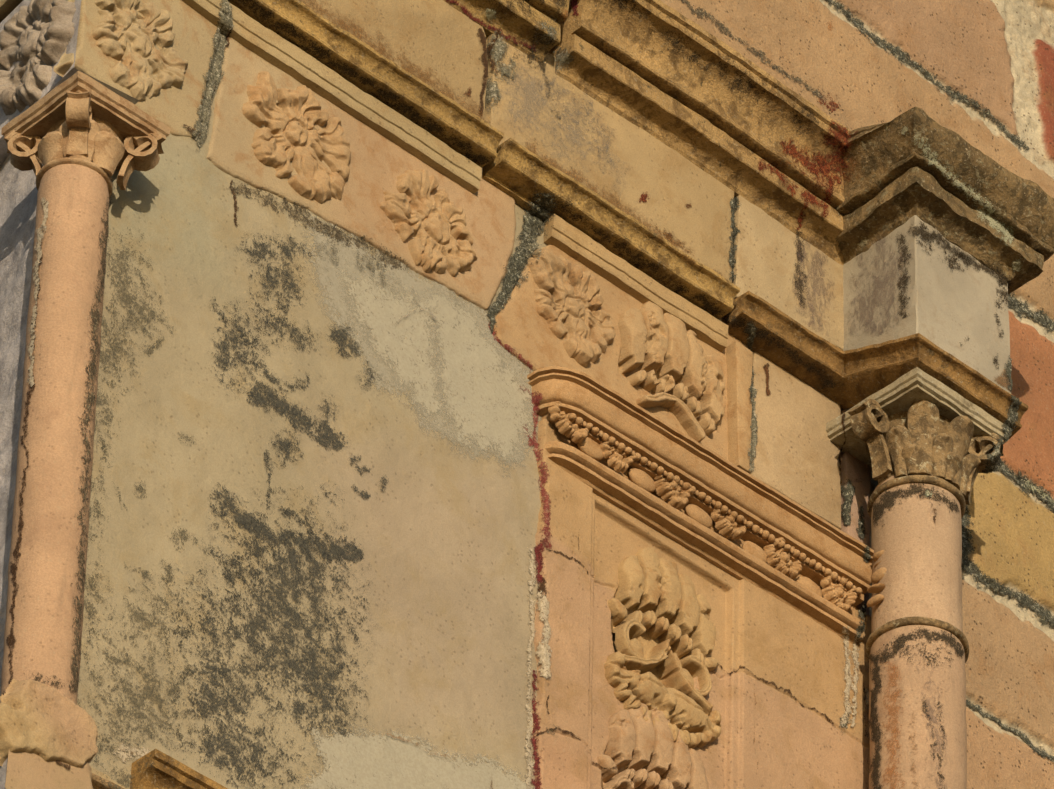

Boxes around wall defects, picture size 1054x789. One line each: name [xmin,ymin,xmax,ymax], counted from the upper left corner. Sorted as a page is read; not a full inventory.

corrosion [758,92,858,230]
peeling [338,270,536,461]
mould [69,179,409,789]
crack [488,323,588,789]
mould [868,481,958,528]
crack [717,663,851,735]
water stain [873,626,964,667]
water stain [922,697,946,789]